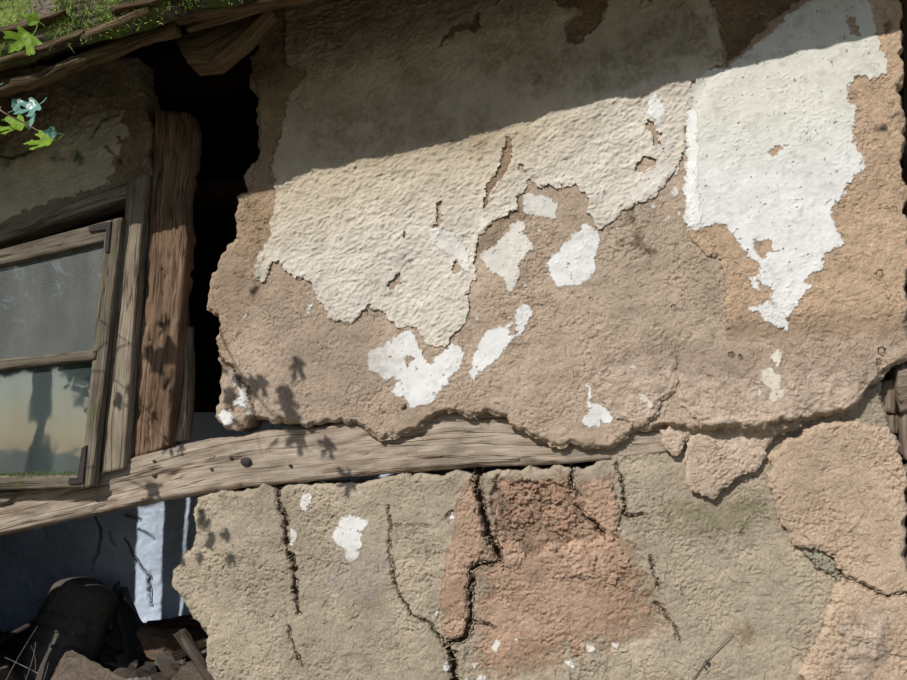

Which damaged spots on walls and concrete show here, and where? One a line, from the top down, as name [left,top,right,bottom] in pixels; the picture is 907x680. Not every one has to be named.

flaking render [235,0,907,409]
peeling [218,376,251,427]
peeling [581,384,614,428]
peeling [638,394,657,412]
crack [615,462,645,520]
crack [89,514,155,608]
crack [274,483,303,669]
crack [386,467,504,680]
flaking render [435,474,654,680]
crack [649,555,681,642]